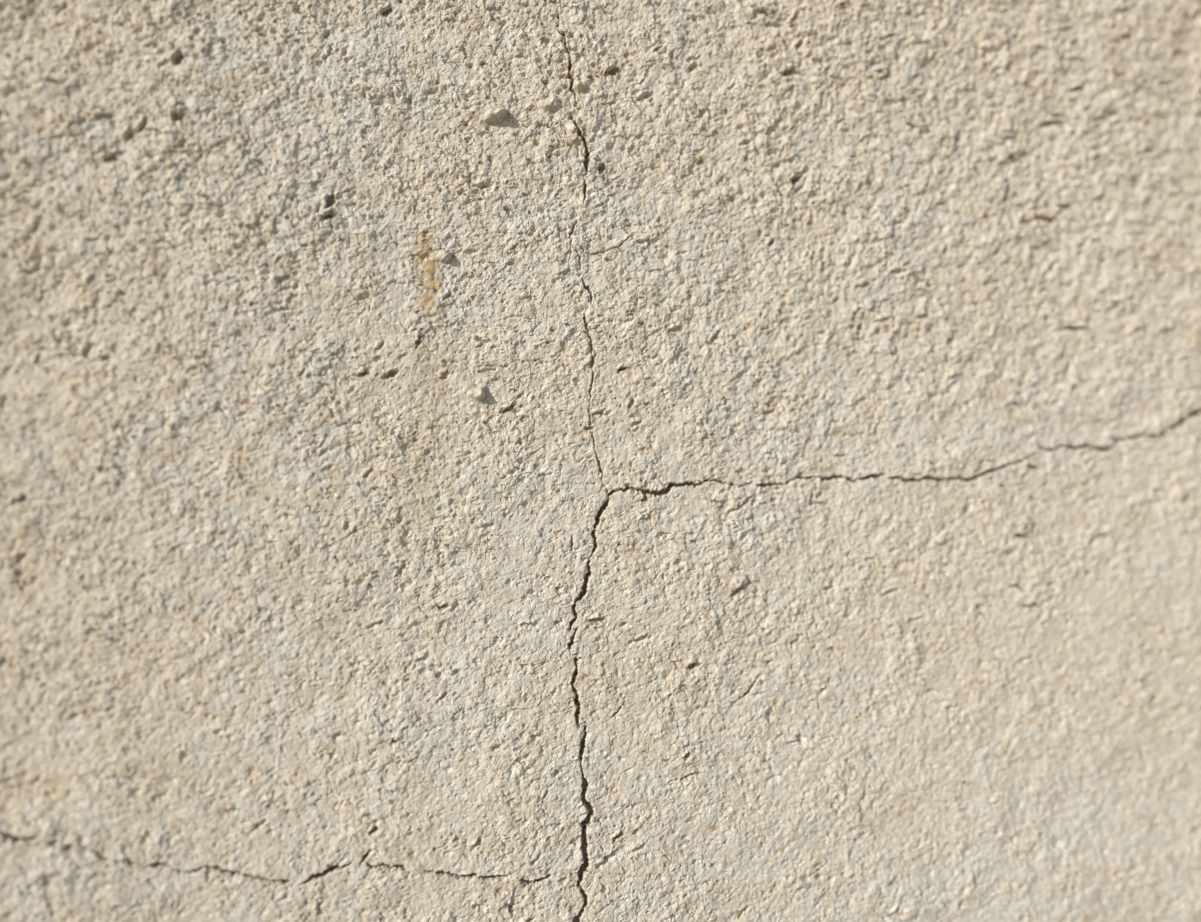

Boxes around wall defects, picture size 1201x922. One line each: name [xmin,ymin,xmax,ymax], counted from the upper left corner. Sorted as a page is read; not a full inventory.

crack [548,17,590,199]
crack [569,227,622,392]
crack [0,408,1201,922]